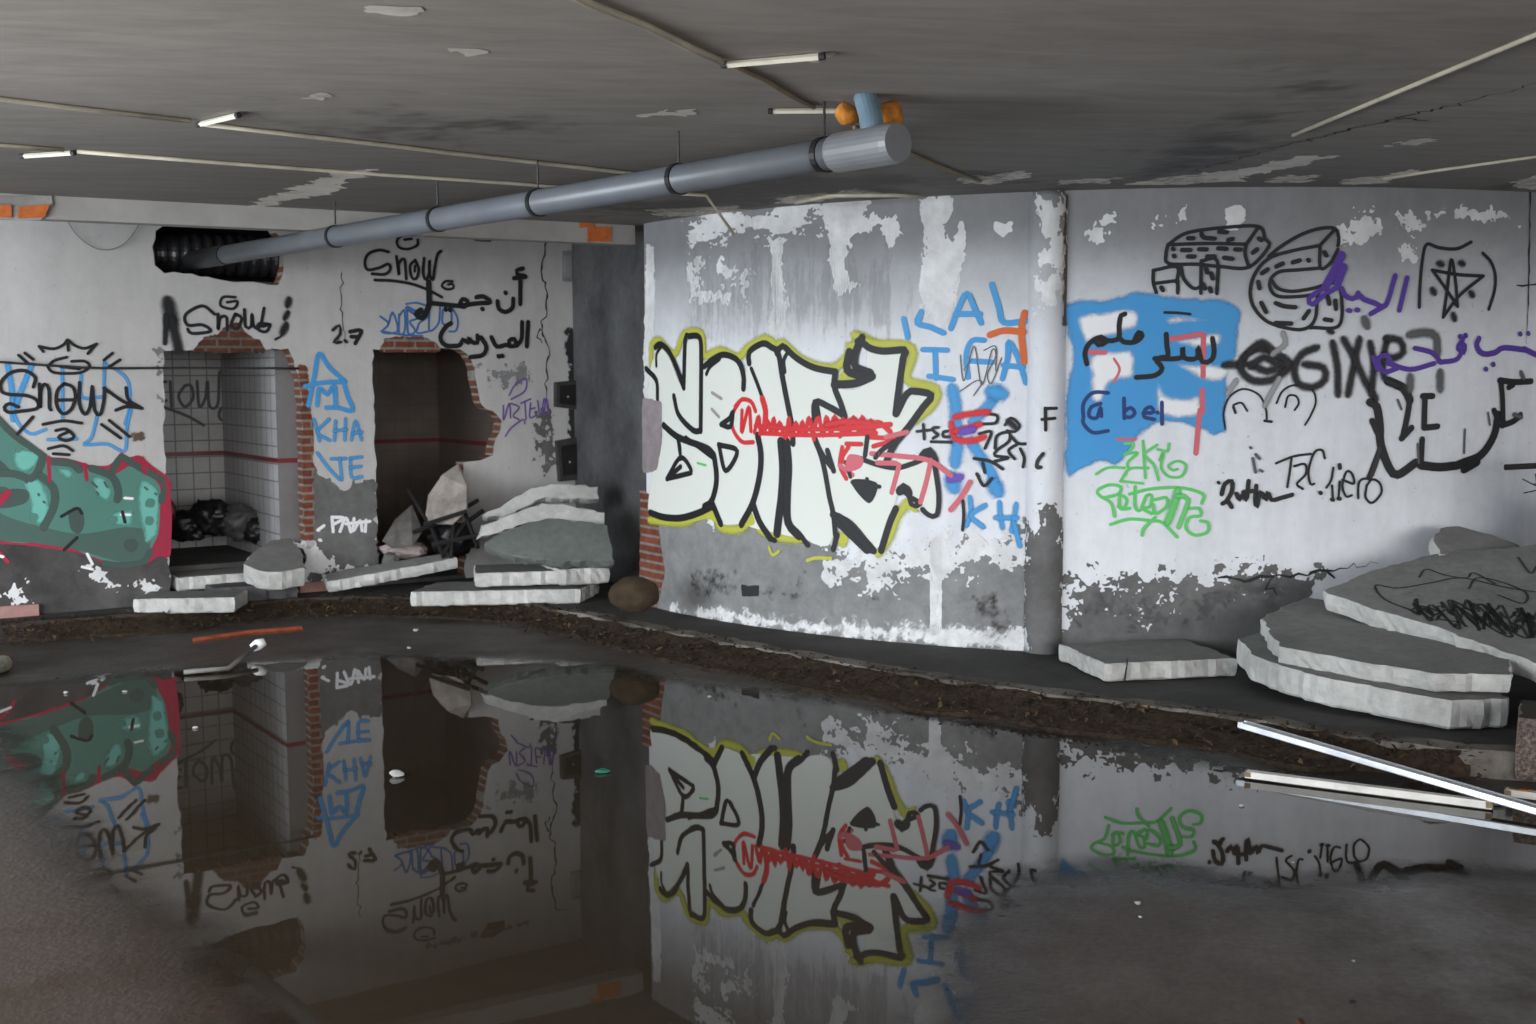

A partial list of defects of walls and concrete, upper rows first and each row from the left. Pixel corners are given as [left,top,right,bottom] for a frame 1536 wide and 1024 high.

crack [1196,83,1533,172]
spalling [0,196,53,220]
spalling [579,222,611,242]
peeling [646,190,903,336]
peeling [919,155,1338,328]
peeling [1341,169,1422,185]
peeling [1336,204,1521,264]
peeling [1510,175,1536,190]
peeling [473,354,533,390]
peeling [564,327,574,381]
peeling [639,244,1332,657]
peeling [0,544,172,614]